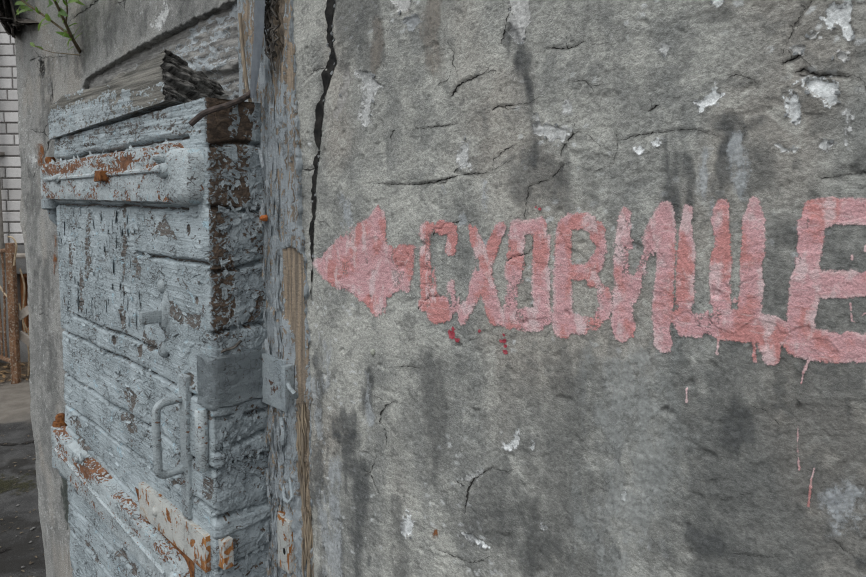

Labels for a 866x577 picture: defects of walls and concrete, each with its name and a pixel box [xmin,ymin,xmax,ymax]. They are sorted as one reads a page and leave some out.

crack [303,0,337,294]
peeling [354,67,384,128]
crack [368,145,514,185]
crack [439,50,496,96]
crack [524,115,717,216]
damp [665,115,746,211]
peeling [693,82,725,114]
peeling [782,75,854,153]
peeling [217,60,284,359]
damp [310,344,368,577]
crack [456,468,513,514]
peeling [502,428,520,451]